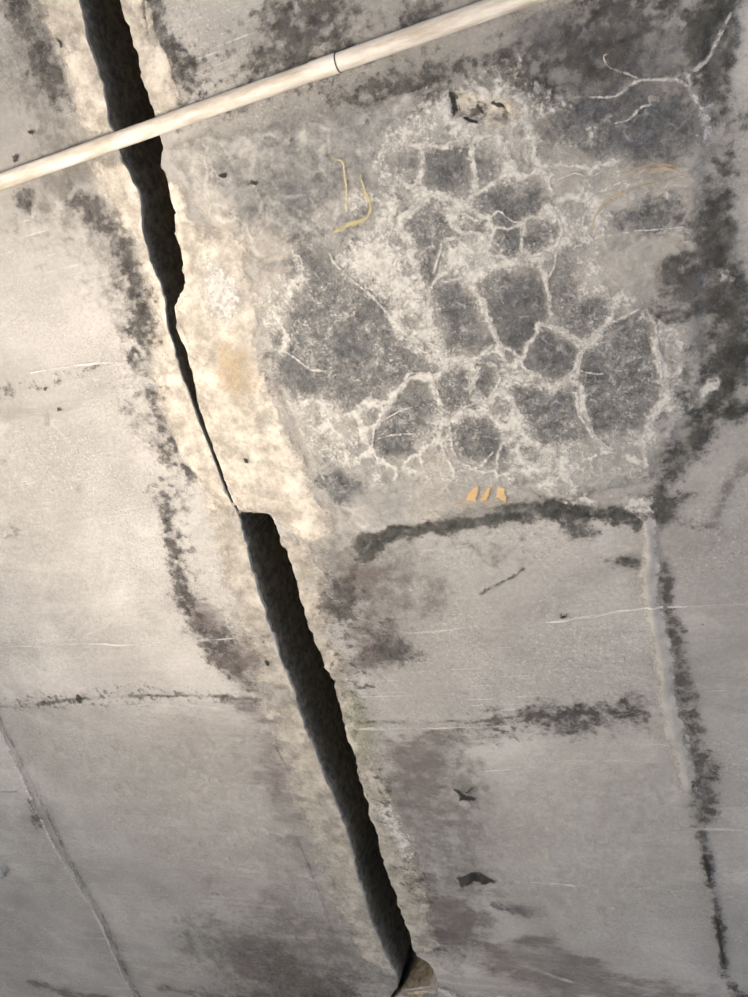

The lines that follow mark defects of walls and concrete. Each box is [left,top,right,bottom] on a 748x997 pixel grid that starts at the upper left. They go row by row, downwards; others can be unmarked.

water stain [15,188,34,212]
water stain [66,187,163,368]
crack [170,328,241,511]
water stain [240,0,748,733]
crack [390,957,426,997]